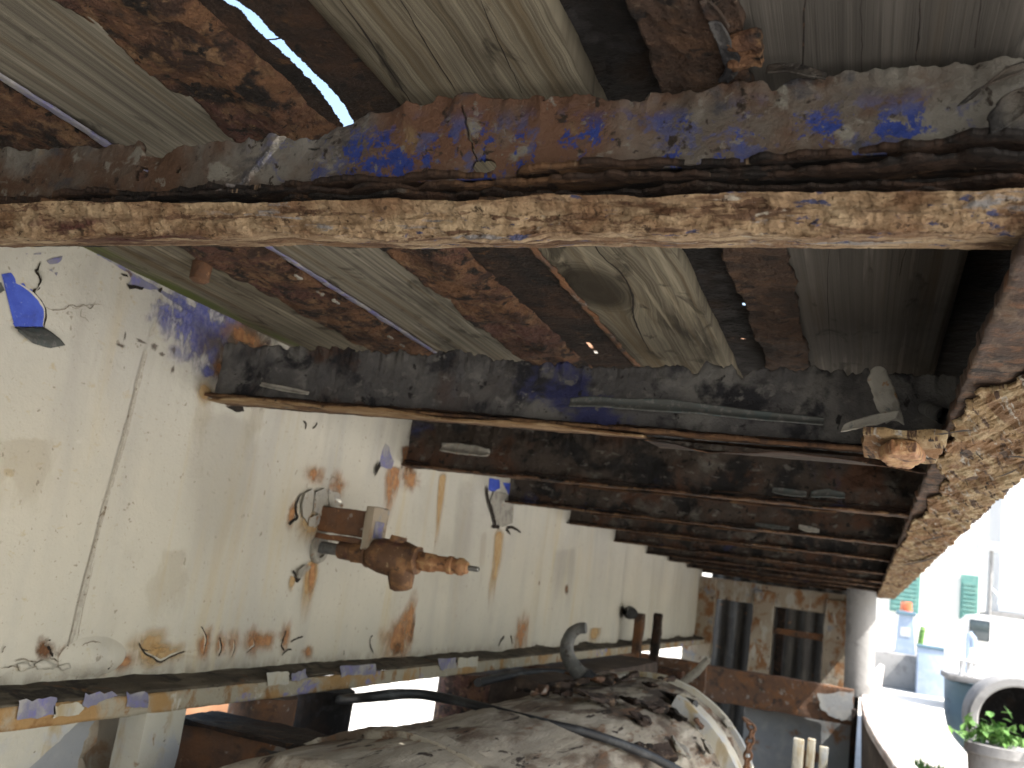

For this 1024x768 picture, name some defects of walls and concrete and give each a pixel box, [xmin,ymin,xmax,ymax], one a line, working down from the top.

peeling [957,61,1024,135]
peeling [0,273,65,348]
peeling [97,254,245,377]
crack [67,294,163,647]
corrosion [308,468,343,494]
peeling [486,478,521,535]
corrosion [289,562,317,596]
corrosion [492,531,503,582]
corrosion [388,603,415,654]